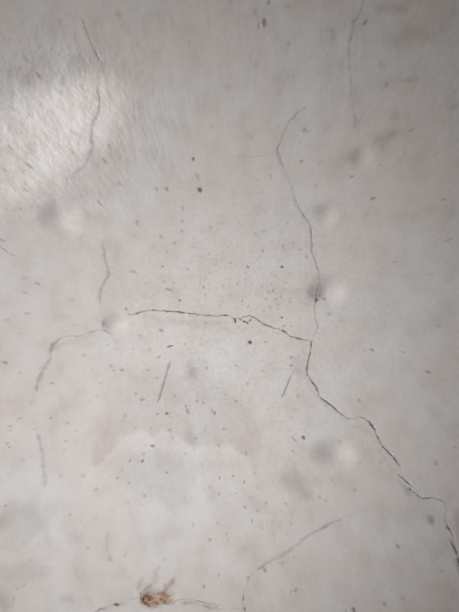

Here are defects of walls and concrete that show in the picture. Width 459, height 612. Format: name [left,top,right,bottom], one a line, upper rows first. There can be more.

crack [208,315,348,419]
crack [368,421,423,499]